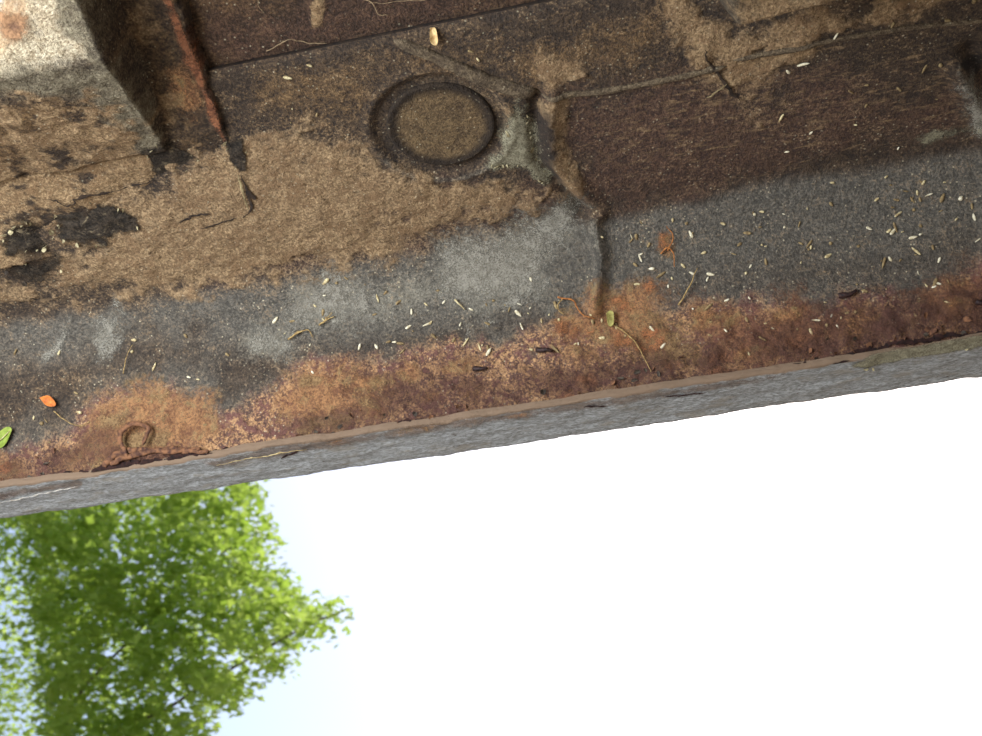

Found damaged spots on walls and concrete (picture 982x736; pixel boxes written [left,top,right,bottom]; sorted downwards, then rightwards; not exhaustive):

corrosion [163,0,223,138]
crack [705,50,740,100]
crack [179,176,256,229]
damp [430,193,593,330]
damp [42,317,70,360]
damp [91,298,125,363]
damp [248,269,382,359]
corrosion [554,281,887,388]
corrosion [915,276,982,337]
corrosion [276,361,418,443]